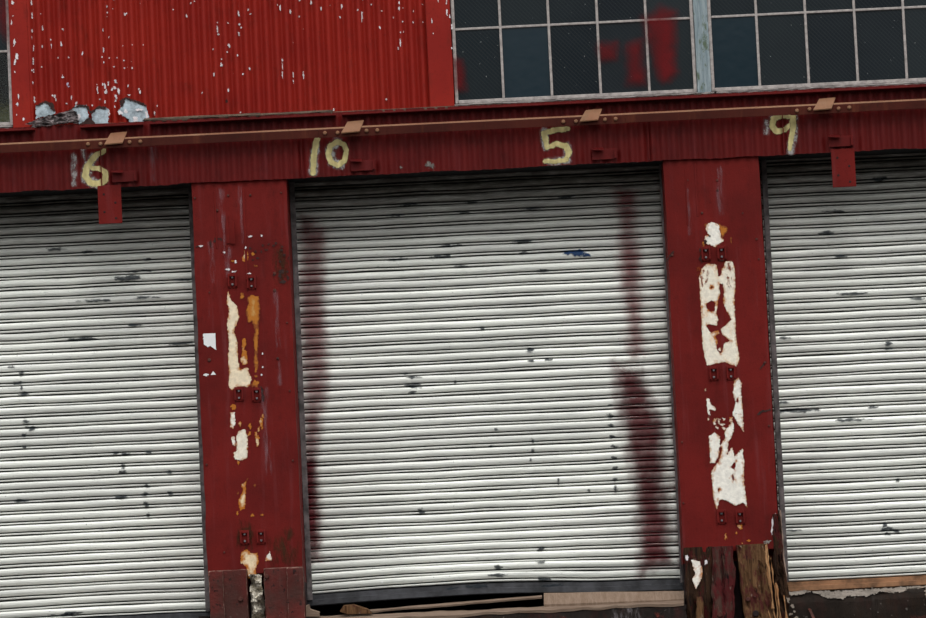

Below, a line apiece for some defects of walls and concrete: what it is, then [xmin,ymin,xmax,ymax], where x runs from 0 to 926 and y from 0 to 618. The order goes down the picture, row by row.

peeling [702,222,732,247]
peeling [227,291,263,390]
peeling [699,261,739,366]
peeling [230,404,264,465]
peeling [704,378,747,509]
peeling [236,478,263,517]
peeling [240,549,272,578]